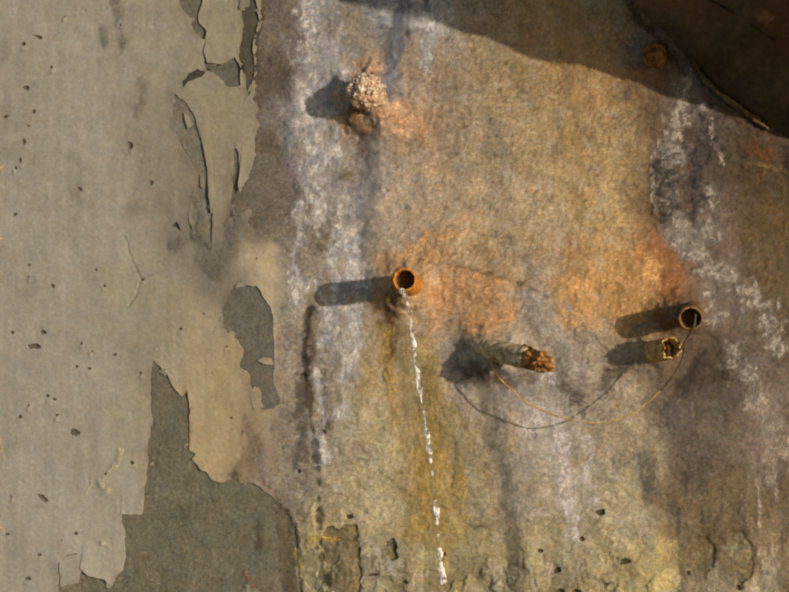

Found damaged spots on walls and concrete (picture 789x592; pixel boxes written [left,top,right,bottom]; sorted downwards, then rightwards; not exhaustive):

peeling [179,0,264,95]
corrosion [329,54,428,160]
peeling [171,94,214,250]
peeling [218,282,284,410]
peeling [229,127,277,218]
water stain [286,0,376,464]
corrosion [438,267,515,342]
water stain [624,0,789,535]
peeling [58,360,304,592]